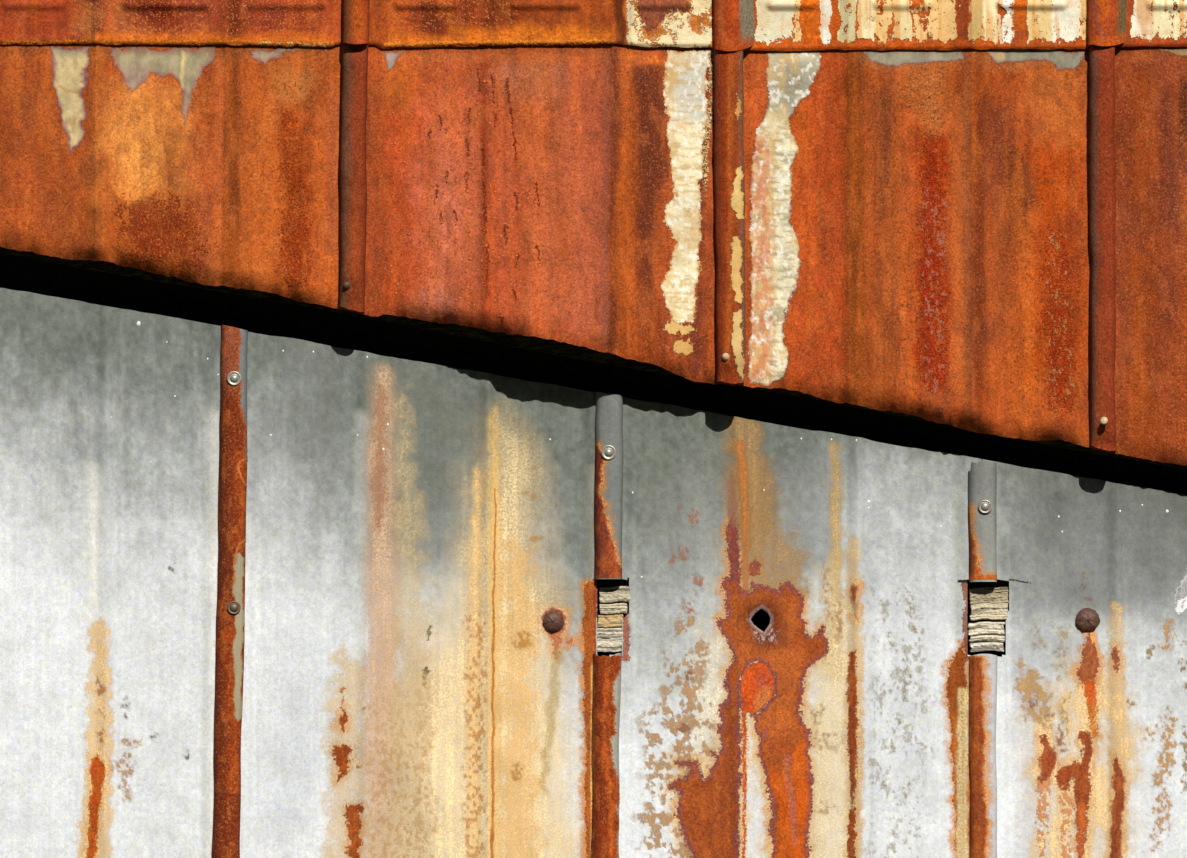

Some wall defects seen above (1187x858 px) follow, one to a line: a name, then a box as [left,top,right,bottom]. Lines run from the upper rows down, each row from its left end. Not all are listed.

peeling [50,45,91,155]
peeling [109,46,216,125]
peeling [249,46,302,64]
peeling [626,0,714,356]
peeling [730,0,1088,416]
peeling [1130,0,1187,56]
corrosion [78,621,114,858]
corrosion [212,325,248,858]
corrosion [325,366,631,858]
corrosion [666,417,865,858]
corrosion [942,505,997,858]
corrosion [1028,602,1138,858]